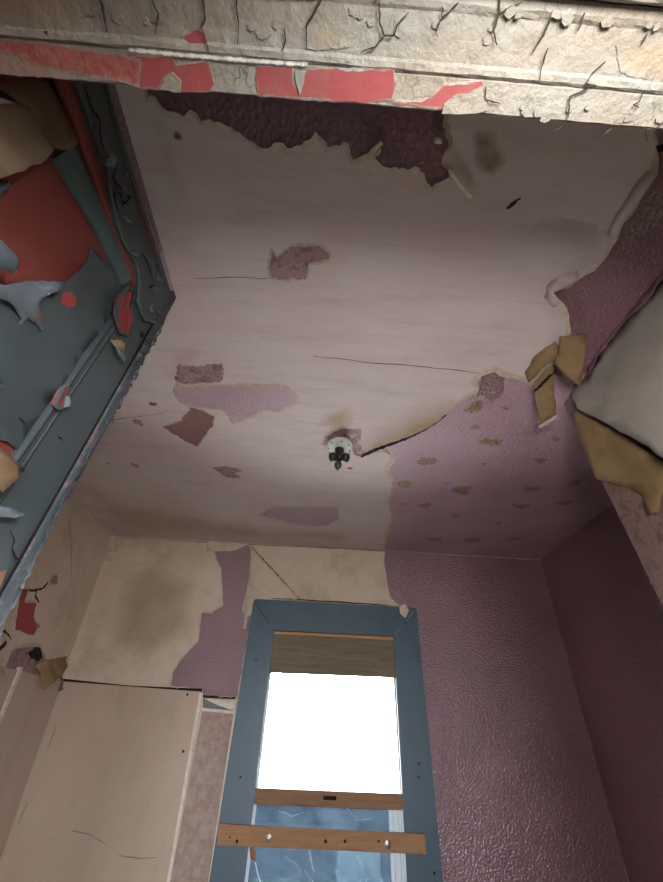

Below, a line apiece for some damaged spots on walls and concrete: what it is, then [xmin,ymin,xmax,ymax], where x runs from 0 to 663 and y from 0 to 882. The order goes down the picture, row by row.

crack [281,0,322,51]
crack [361,0,409,53]
crack [435,2,459,37]
crack [492,0,522,45]
crack [531,17,552,79]
peeling [551,7,575,26]
crack [553,61,606,131]
water stain [468,123,510,180]
peeling [0,30,488,469]
crack [360,415,447,458]
peeling [258,506,339,527]
peeling [0,524,54,676]